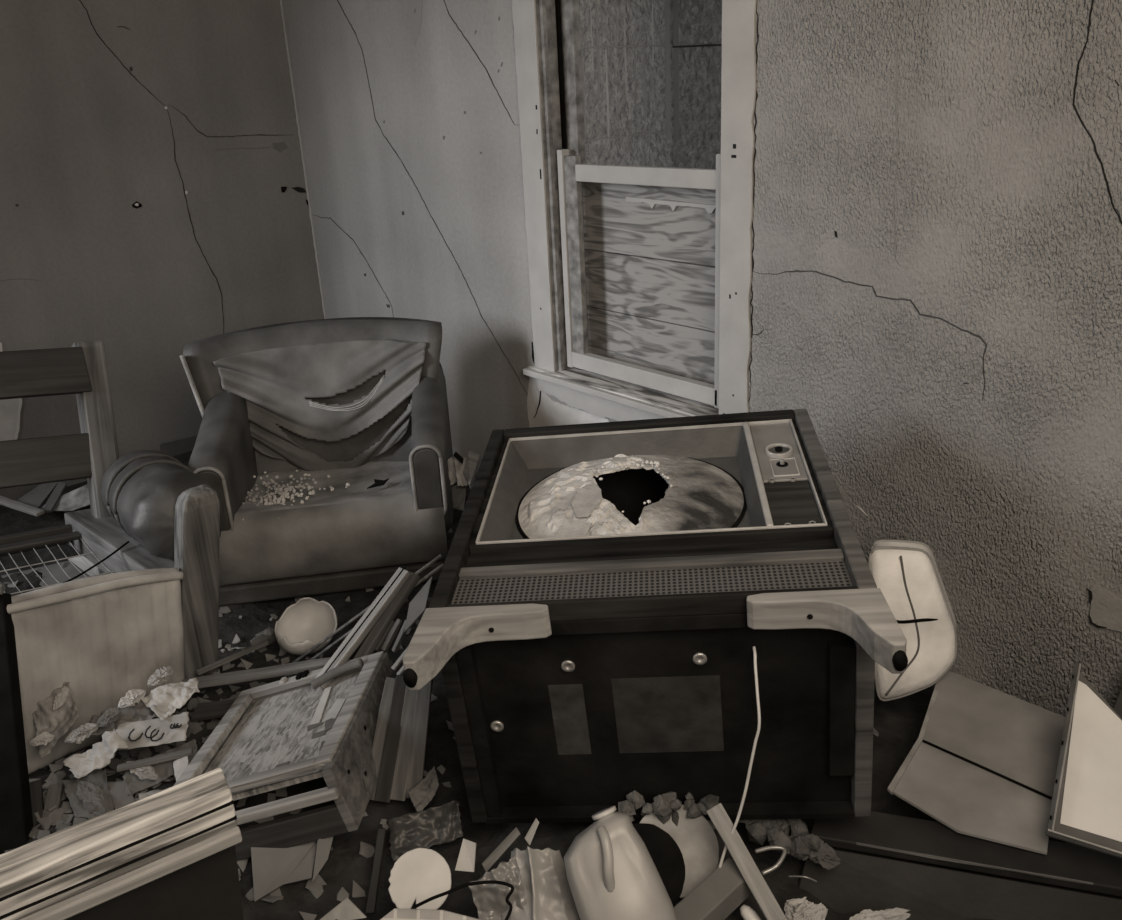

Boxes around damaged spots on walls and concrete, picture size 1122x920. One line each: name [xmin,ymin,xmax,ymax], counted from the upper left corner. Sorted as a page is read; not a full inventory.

crack [79,0,281,334]
crack [314,215,394,317]
crack [337,0,541,418]
crack [748,4,987,403]
crack [1073,0,1122,224]
spalling [0,398,20,441]
crack [1087,588,1107,628]